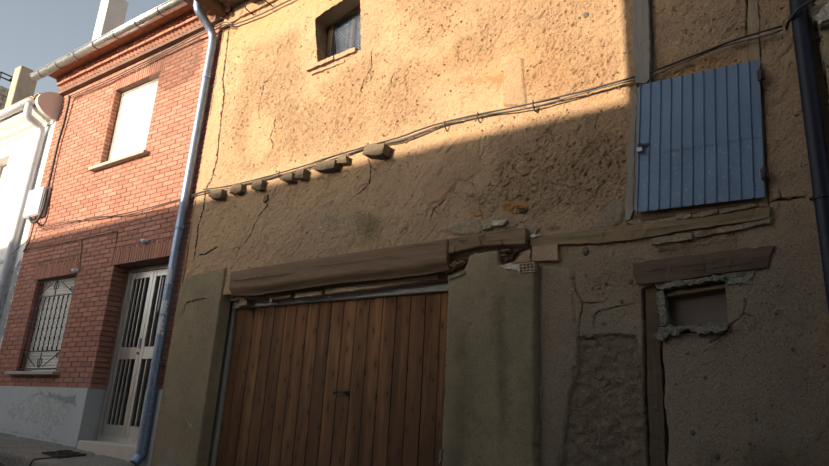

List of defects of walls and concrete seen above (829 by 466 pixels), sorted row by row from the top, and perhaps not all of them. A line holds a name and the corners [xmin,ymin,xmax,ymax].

crack [742,0,750,35]
crack [194,29,278,258]
peeling [439,202,530,236]
crack [574,277,635,326]